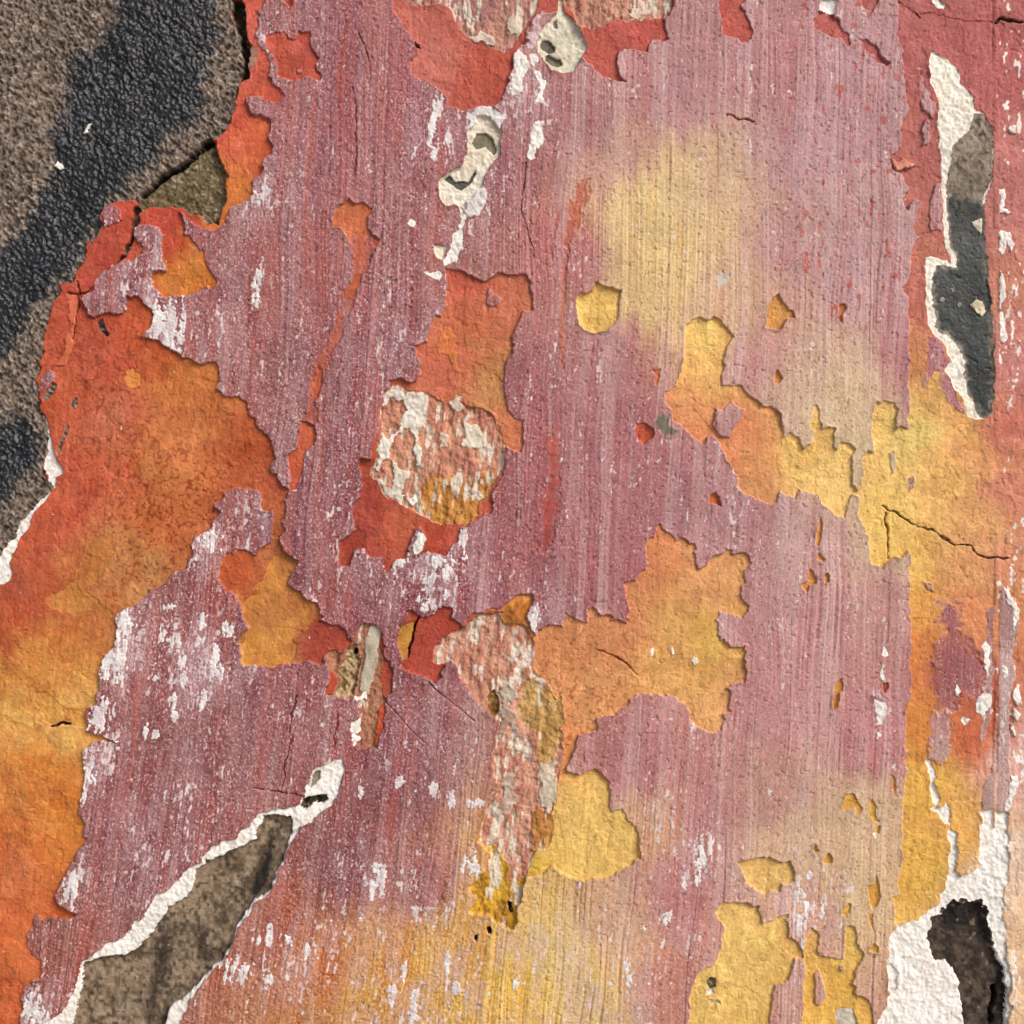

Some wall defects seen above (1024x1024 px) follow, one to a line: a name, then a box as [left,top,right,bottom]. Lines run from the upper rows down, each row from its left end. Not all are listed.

crack [118,140,216,262]
peeling [0,0,753,1024]
peeling [652,0,1024,1024]
crack [881,505,1008,560]